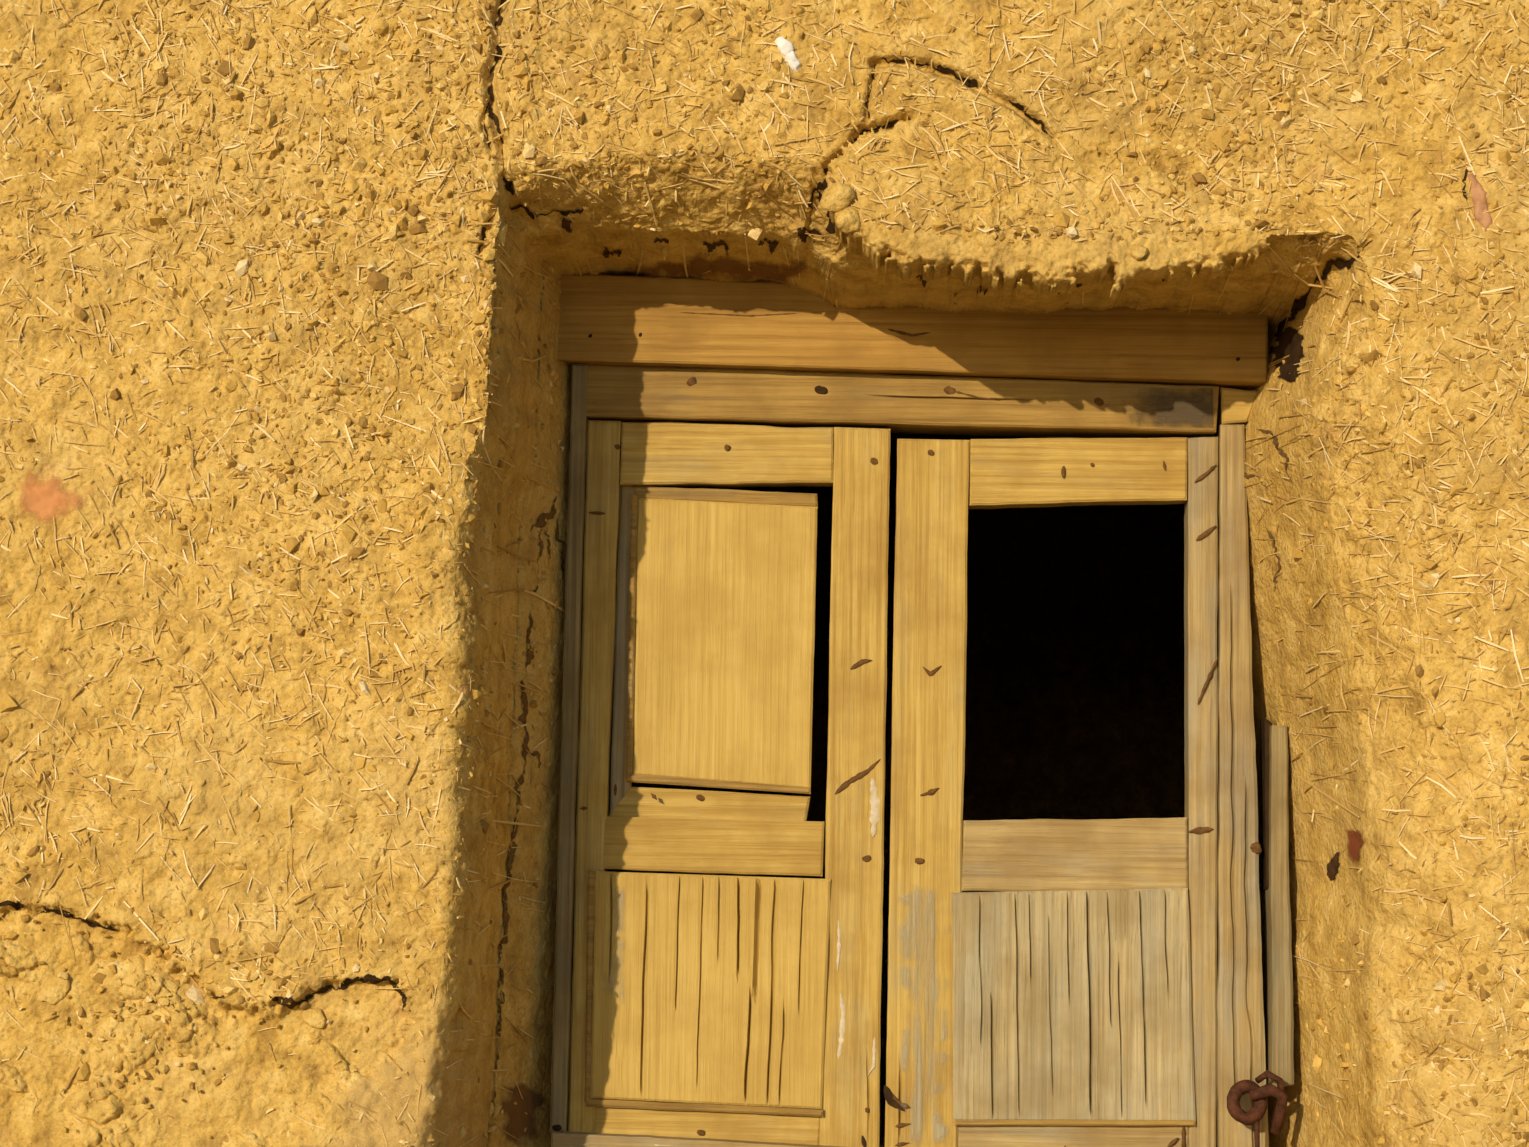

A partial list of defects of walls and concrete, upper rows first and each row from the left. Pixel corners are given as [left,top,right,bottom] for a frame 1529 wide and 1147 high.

crack [478,0,584,253]
crack [808,57,1047,234]
crack [496,497,565,1037]
crack [0,900,118,931]
crack [269,974,407,1013]